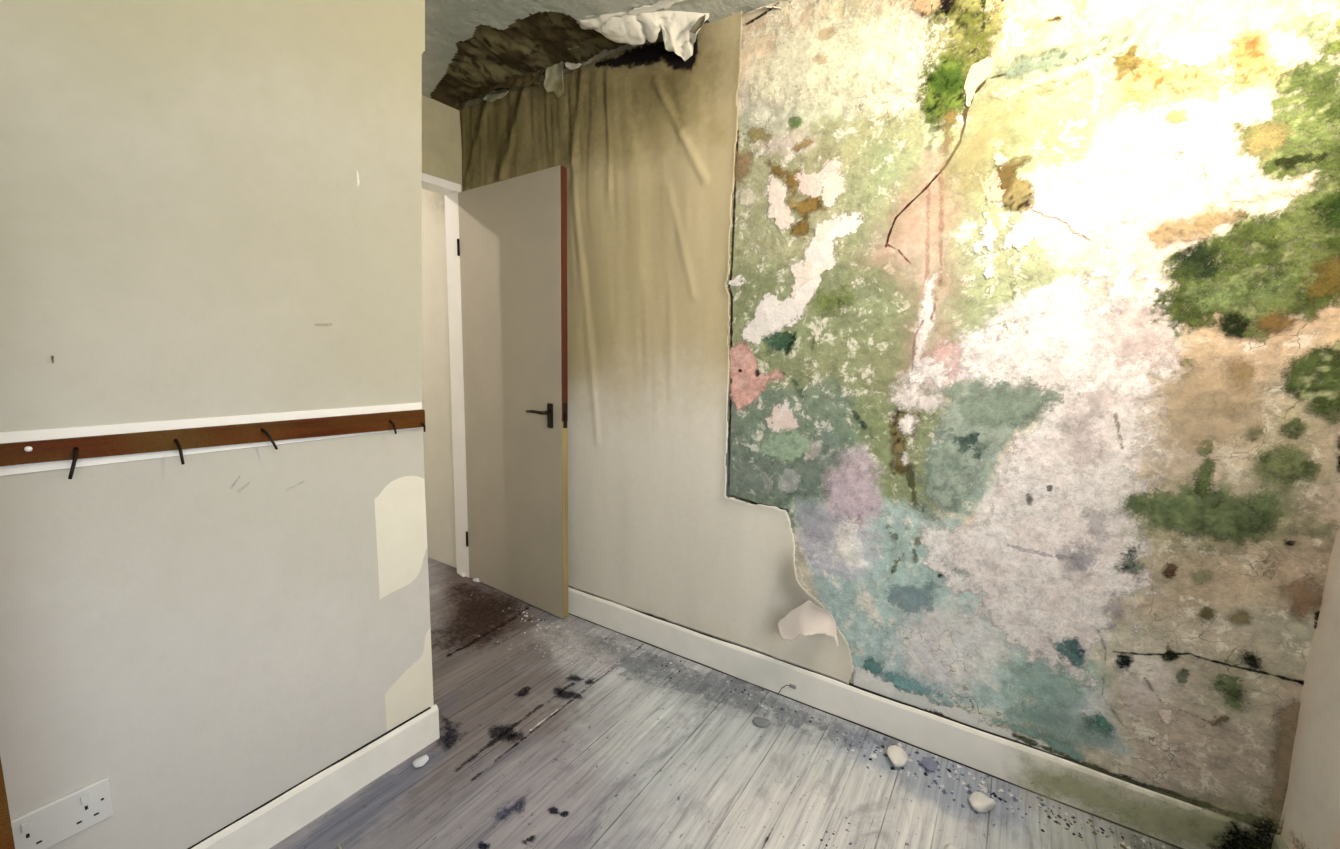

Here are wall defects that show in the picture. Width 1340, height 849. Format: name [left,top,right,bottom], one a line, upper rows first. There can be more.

peeling [742,0,788,25]
peeling [543,46,581,98]
leakage [459,62,697,179]
peeling [728,275,745,287]
peeling [740,159,867,346]
peeling [972,152,1100,279]
leakage [900,18,1340,687]
peeling [765,397,824,494]
peeling [852,666,1276,829]
leakage [1084,713,1115,738]
crack [1097,630,1304,828]
leakage [1031,771,1304,849]